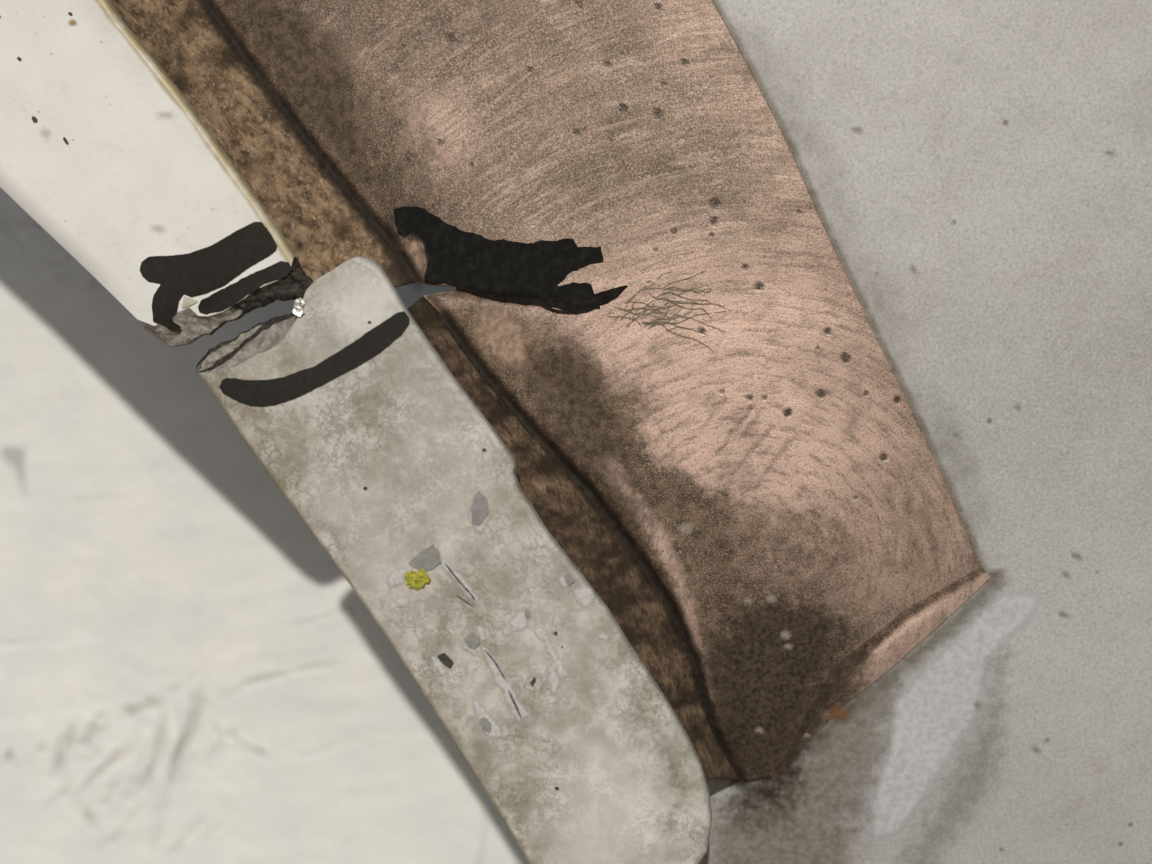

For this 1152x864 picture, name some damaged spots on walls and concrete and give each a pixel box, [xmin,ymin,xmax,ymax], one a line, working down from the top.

peeling [182,296,197,308]